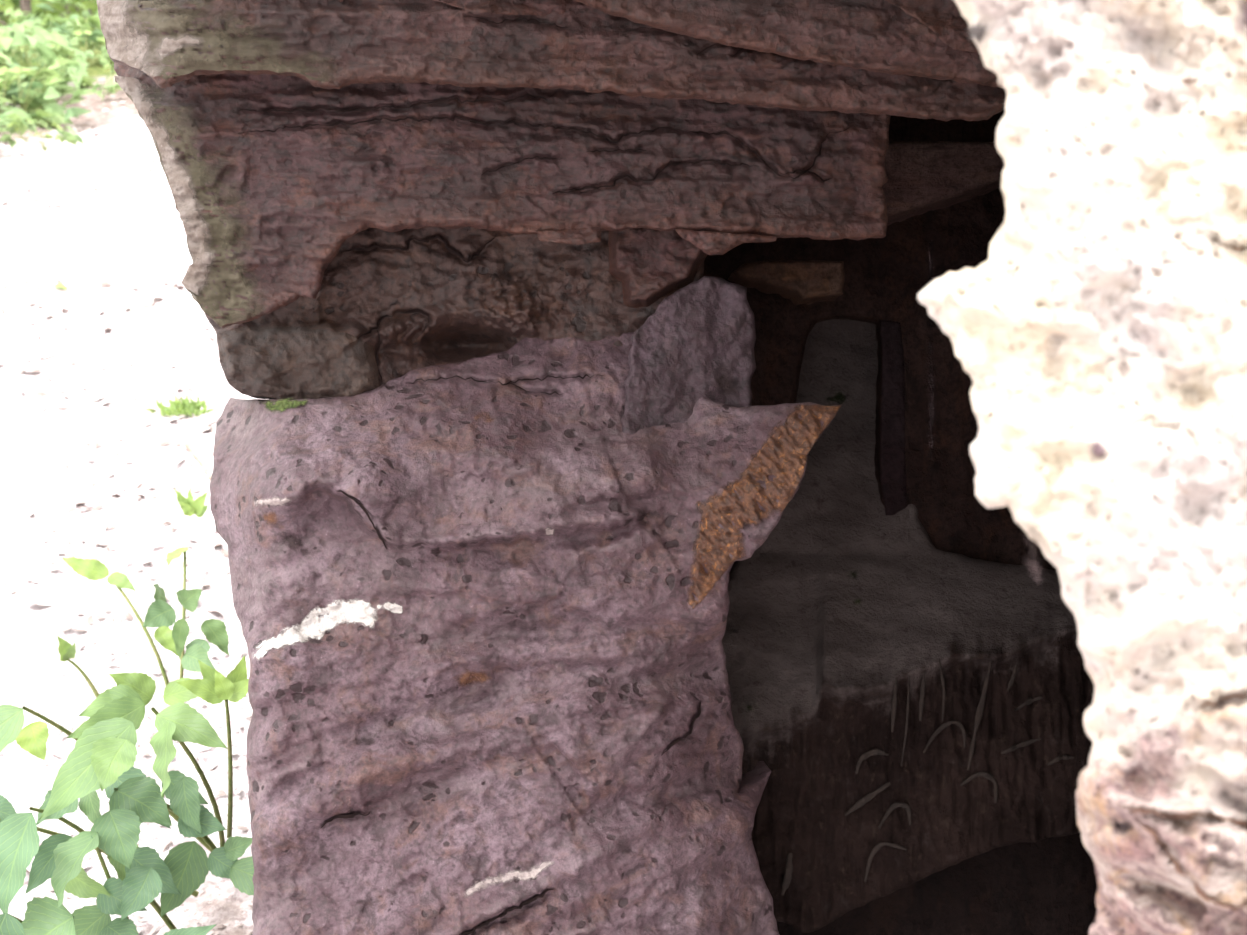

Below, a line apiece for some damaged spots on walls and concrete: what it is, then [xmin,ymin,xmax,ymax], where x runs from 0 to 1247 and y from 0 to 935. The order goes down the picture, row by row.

crack [462,888,556,935]